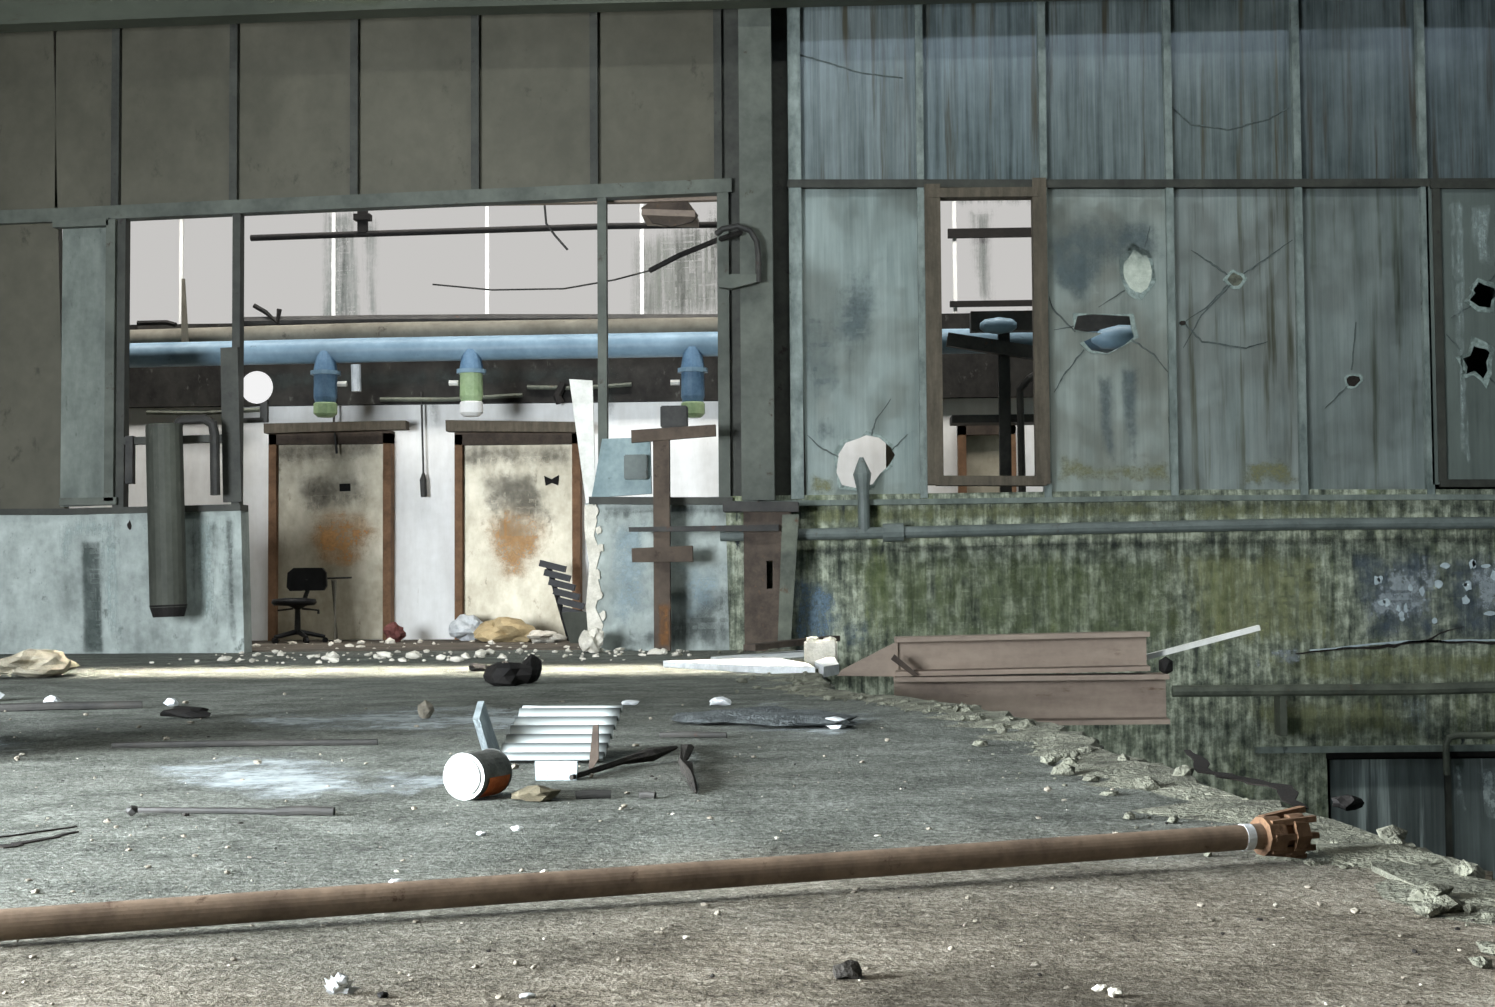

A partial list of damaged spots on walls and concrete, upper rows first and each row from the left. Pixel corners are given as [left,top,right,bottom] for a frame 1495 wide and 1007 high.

corrosion [495,513,540,572]
leakage [796,580,866,639]
leakage [1358,555,1495,635]
leakage [252,709,515,729]
leakage [166,760,444,796]
spalling [1371,843,1462,886]